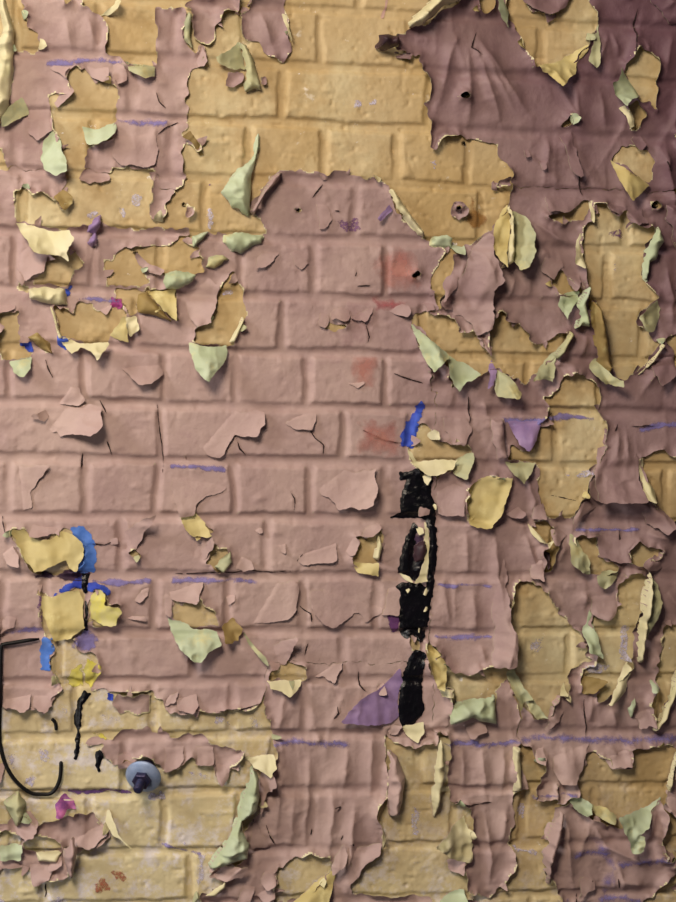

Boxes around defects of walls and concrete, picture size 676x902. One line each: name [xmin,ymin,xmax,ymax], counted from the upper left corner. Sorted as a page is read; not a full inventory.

peeling [0,0,574,718]
peeling [375,0,676,902]
peeling [0,791,132,887]
peeling [86,726,244,787]
peeling [200,660,453,902]